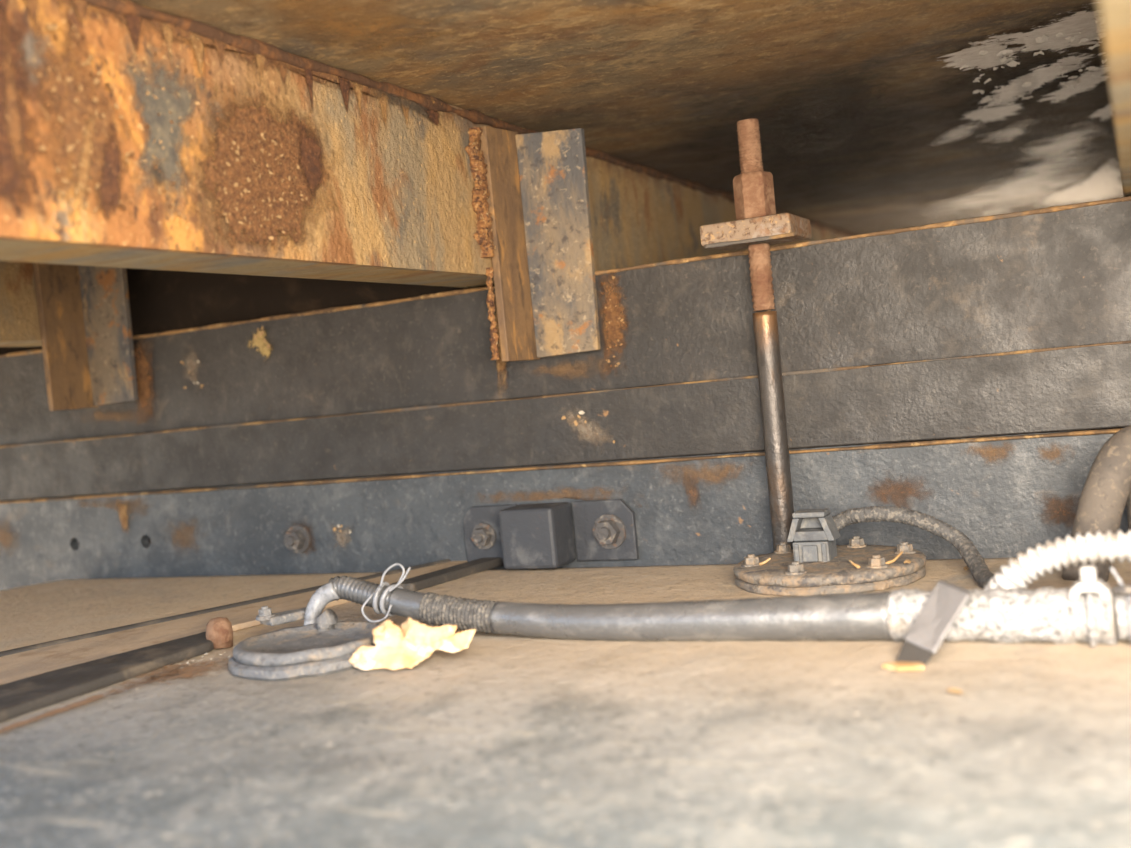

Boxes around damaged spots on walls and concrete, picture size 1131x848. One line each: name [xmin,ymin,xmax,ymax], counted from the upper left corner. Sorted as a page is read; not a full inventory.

corrosion [0,0,135,218]
corrosion [103,9,440,252]
peeling [936,2,1107,144]
peeling [930,104,1124,215]
peeling [247,326,272,360]
corrosion [0,127,758,448]
peeling [562,411,615,443]
corrosion [595,196,1131,376]